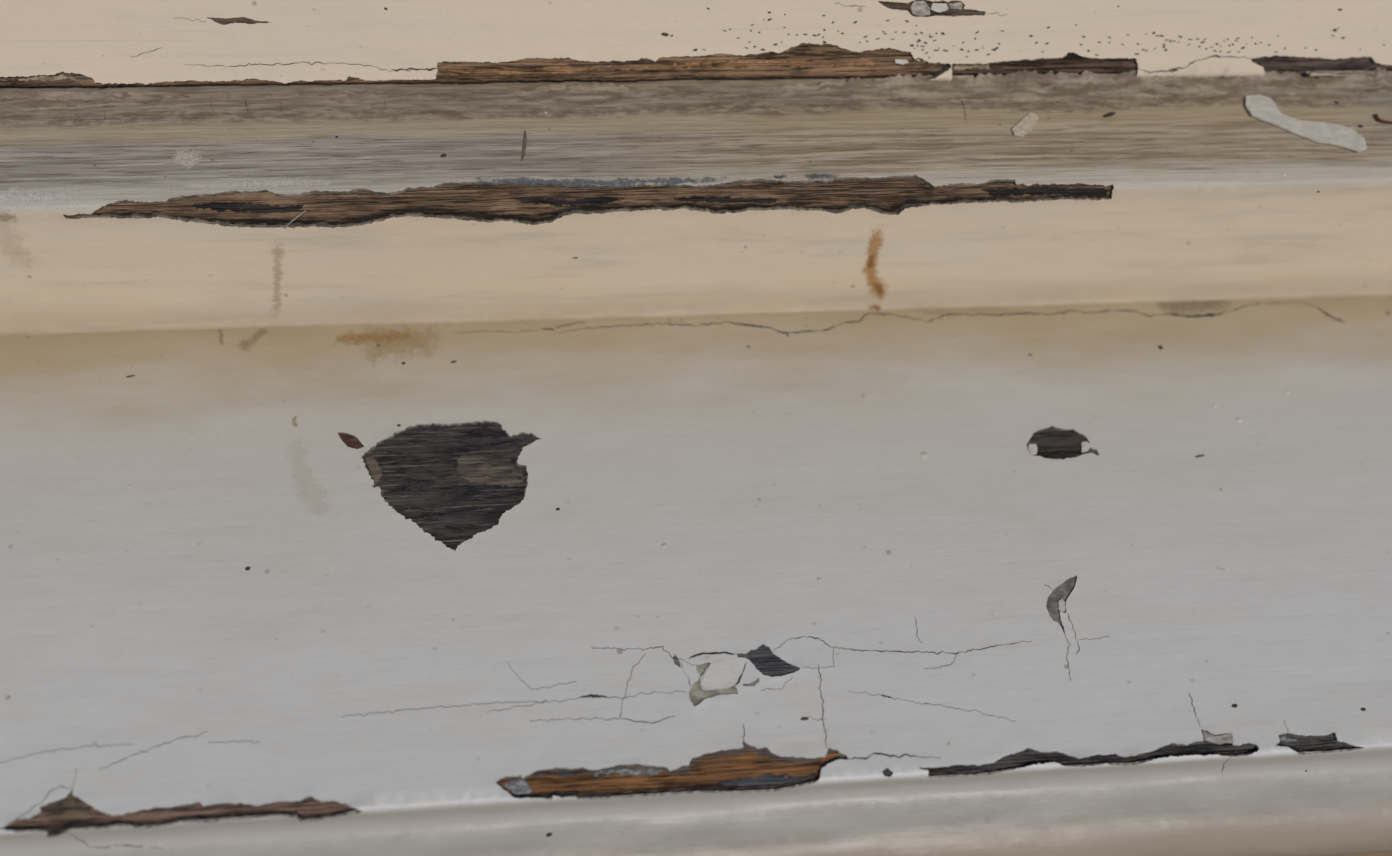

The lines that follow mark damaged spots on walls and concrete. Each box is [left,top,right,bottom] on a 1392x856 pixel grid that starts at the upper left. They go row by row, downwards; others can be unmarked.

peeling [0,0,1392,88]
peeling [67,177,1113,226]
rust [863,229,884,310]
crack [457,302,1345,336]
peeling [1027,426,1098,460]
peeling [338,422,539,551]
peeling [1045,576,1108,680]
crack [341,657,682,724]
peeling [496,694,1258,798]
crack [806,664,1011,747]
peeling [1276,722,1360,752]
peeling [0,778,357,848]